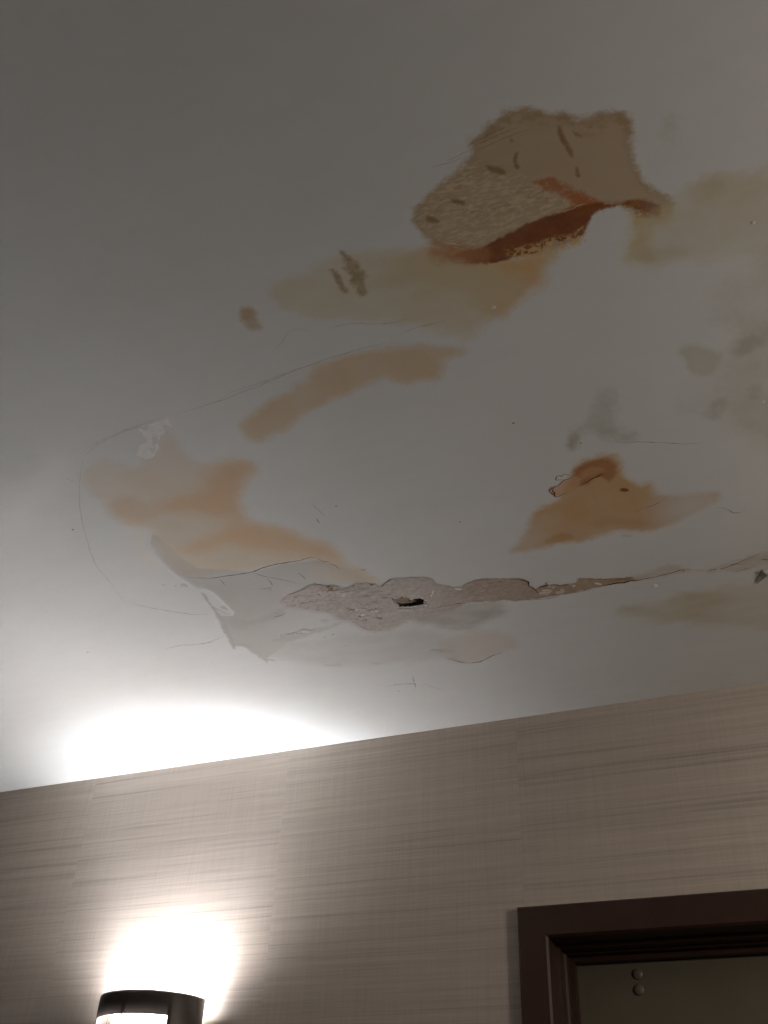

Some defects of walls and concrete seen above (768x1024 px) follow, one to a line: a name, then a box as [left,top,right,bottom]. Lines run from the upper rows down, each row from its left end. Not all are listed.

leakage [69,96,768,588]
crack [190,557,340,589]
flaking render [146,531,641,651]